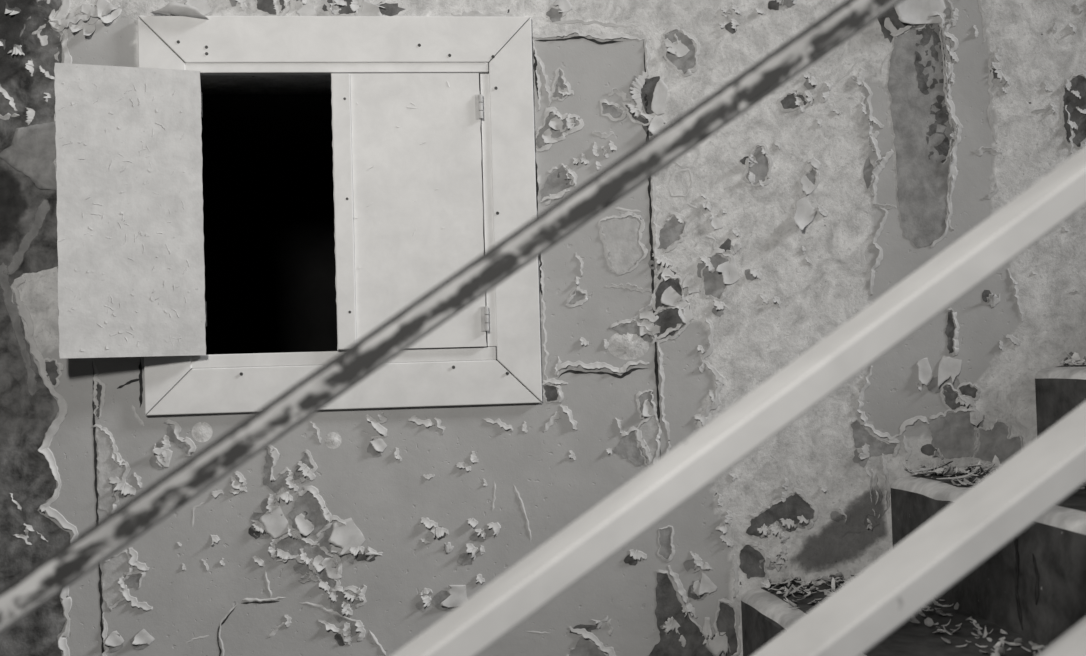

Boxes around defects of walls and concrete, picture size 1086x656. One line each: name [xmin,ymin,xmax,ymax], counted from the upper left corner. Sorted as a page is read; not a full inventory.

peeling [533,39,668,211]
spalling [860,0,963,295]
spalling [1031,70,1086,154]
spalling [0,0,122,590]
peeling [598,162,762,427]
peeling [92,379,142,514]
peeling [851,307,1025,530]
spalling [0,586,72,656]
peeling [102,547,153,612]
peeling [248,421,386,656]
peeling [415,517,501,612]
spalling [624,478,849,656]